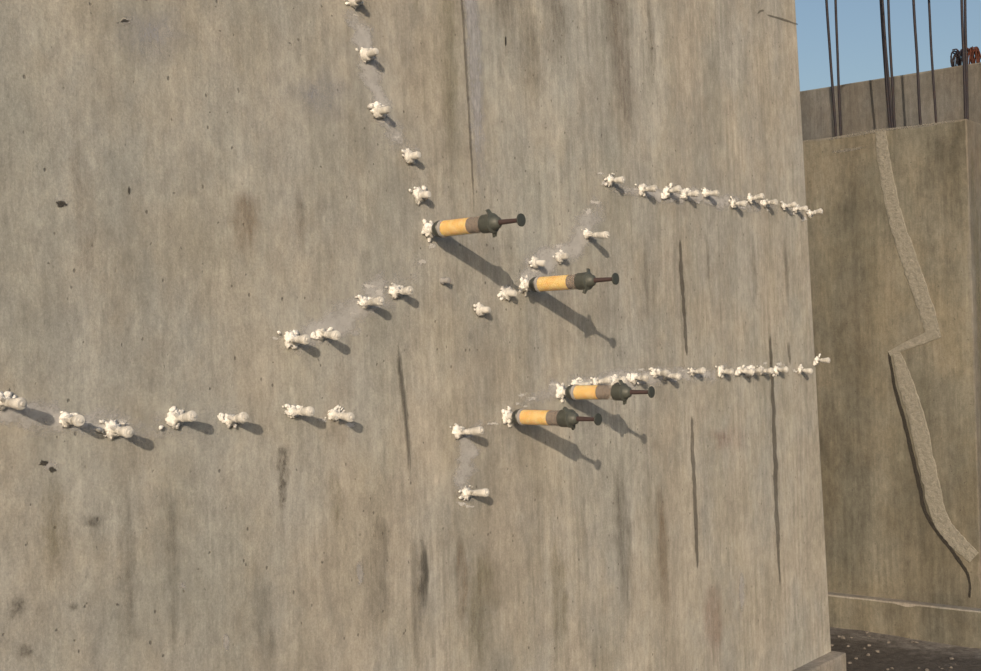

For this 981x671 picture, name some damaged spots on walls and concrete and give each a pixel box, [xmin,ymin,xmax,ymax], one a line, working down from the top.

crack [347,8,416,150]
crack [416,243,436,265]
crack [519,172,807,294]
crack [273,274,390,350]
crack [0,403,135,431]
crack [318,418,356,428]
crack [516,362,795,408]
crack [875,130,979,598]
crack [454,422,498,508]